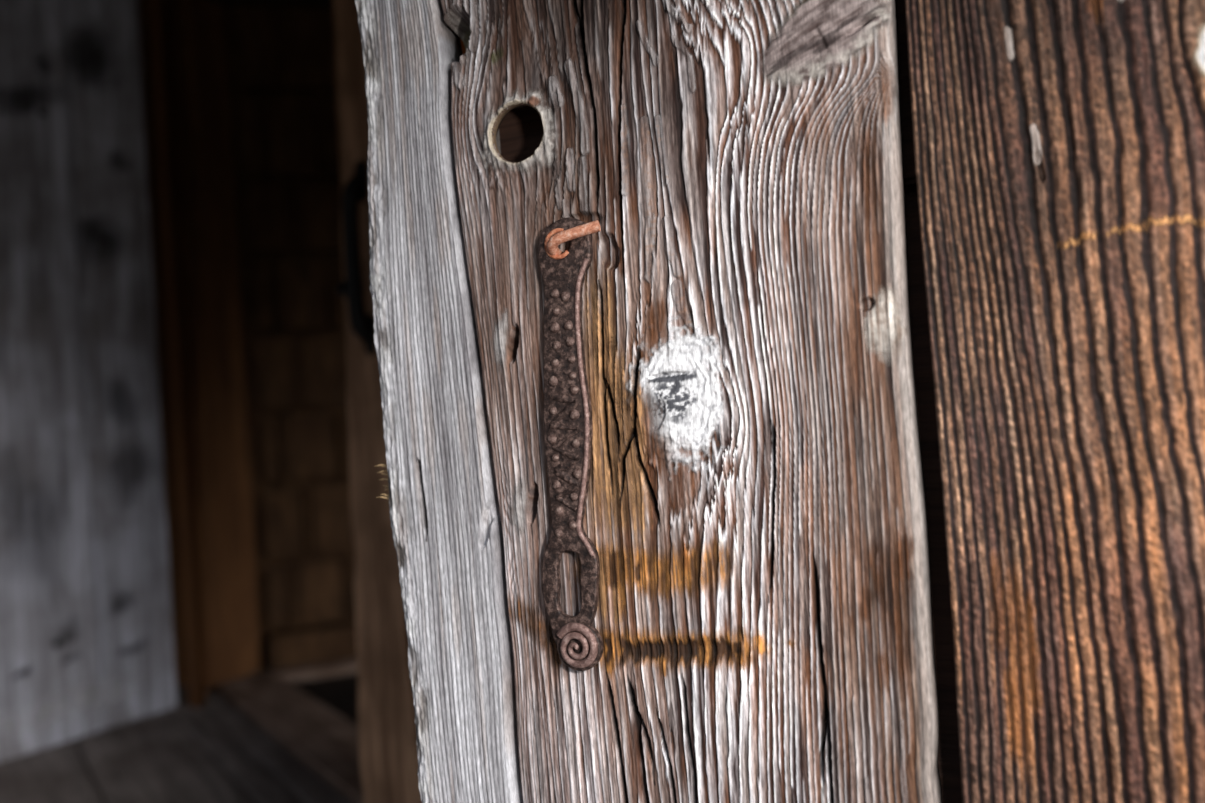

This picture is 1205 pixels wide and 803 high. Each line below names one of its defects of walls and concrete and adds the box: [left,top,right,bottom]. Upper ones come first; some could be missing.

crack [575,0,661,531]
rust [589,284,661,535]
rust [596,538,769,677]